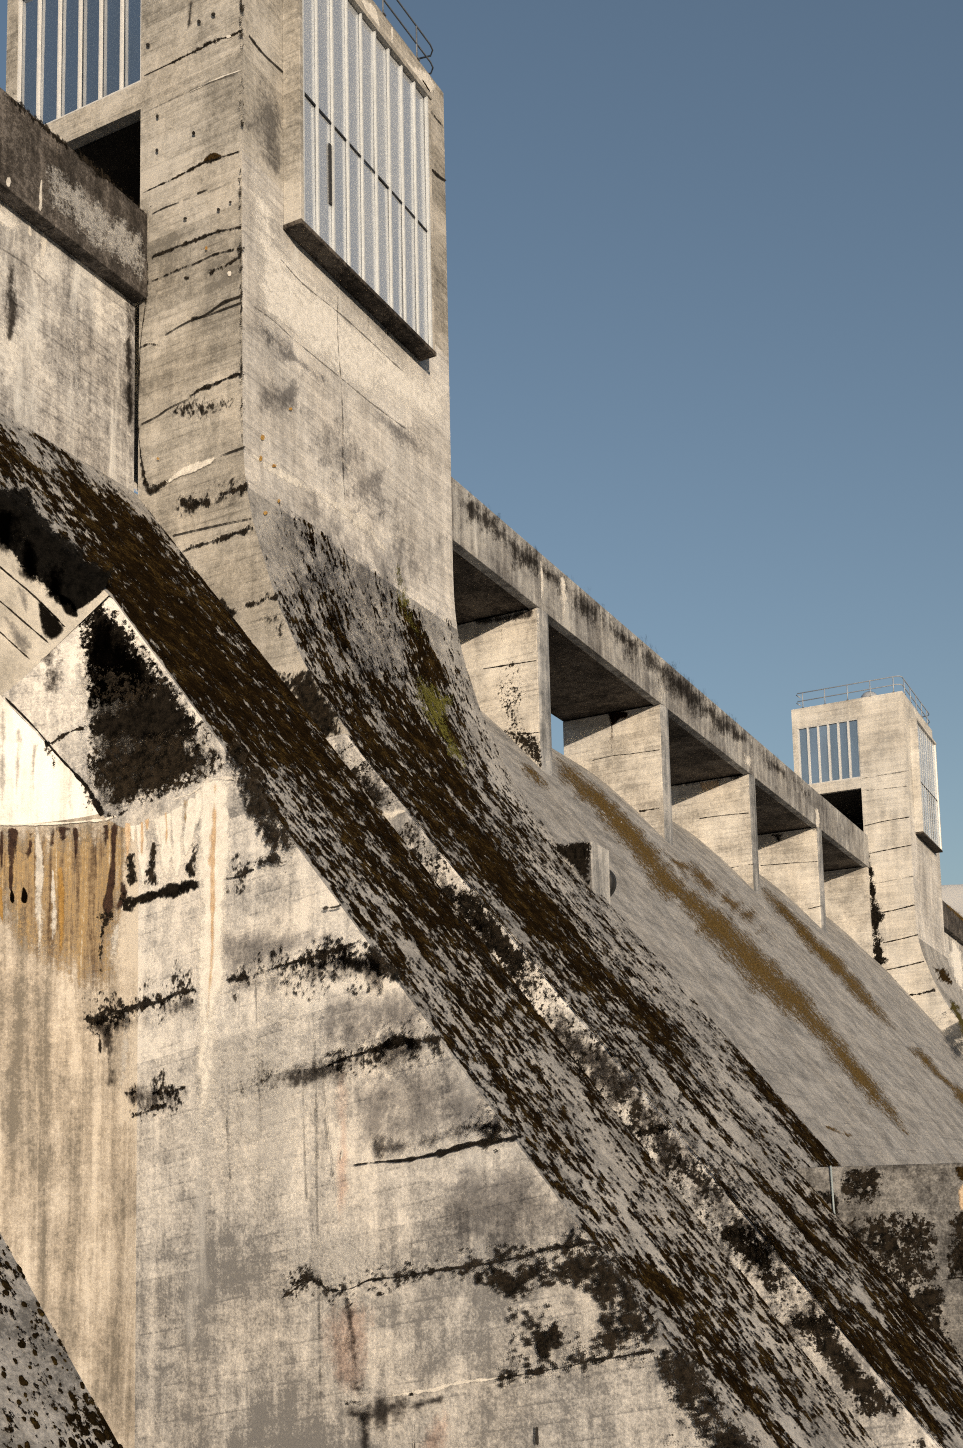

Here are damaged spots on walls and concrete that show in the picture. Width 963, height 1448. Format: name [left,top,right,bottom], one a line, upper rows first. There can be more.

leakage [463,501,785,775]
corrosion [0,813,168,988]
leakage [0,486,295,1123]
leakage [273,661,903,1448]
leakage [818,1166,963,1361]